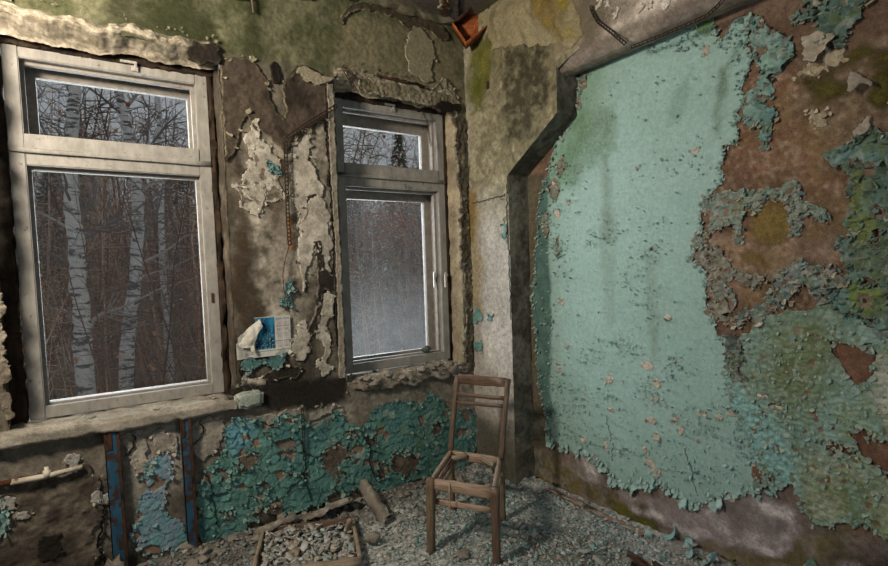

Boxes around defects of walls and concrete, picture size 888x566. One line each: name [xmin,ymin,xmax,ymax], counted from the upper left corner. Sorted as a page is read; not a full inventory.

leakage [502,43,547,139]
spalling [0,0,494,391]
peeling [529,0,888,540]
spalling [0,293,15,421]
spalling [0,453,109,566]
peeling [120,426,187,559]
crack [287,440,318,498]
peeling [192,392,479,543]
efflorescence [622,495,795,557]